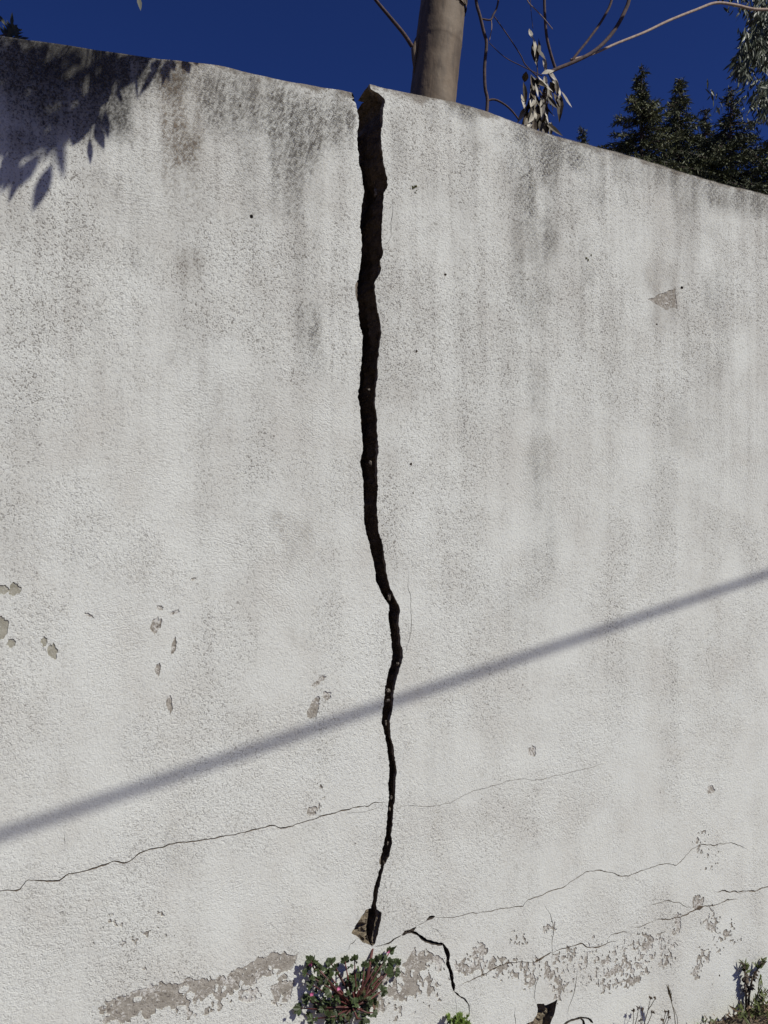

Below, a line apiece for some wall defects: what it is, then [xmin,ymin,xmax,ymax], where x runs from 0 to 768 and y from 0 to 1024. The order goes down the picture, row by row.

spalling [648,289,677,310]
crack [1,84,629,1013]
peeling [0,582,22,596]
peeling [0,616,16,648]
peeling [41,636,58,660]
peeling [150,605,180,635]
crack [486,842,746,912]
crack [635,886,768,928]
peeling [690,894,742,980]
peeling [91,951,298,1024]
peeling [362,912,681,1024]
crack [564,976,593,1024]